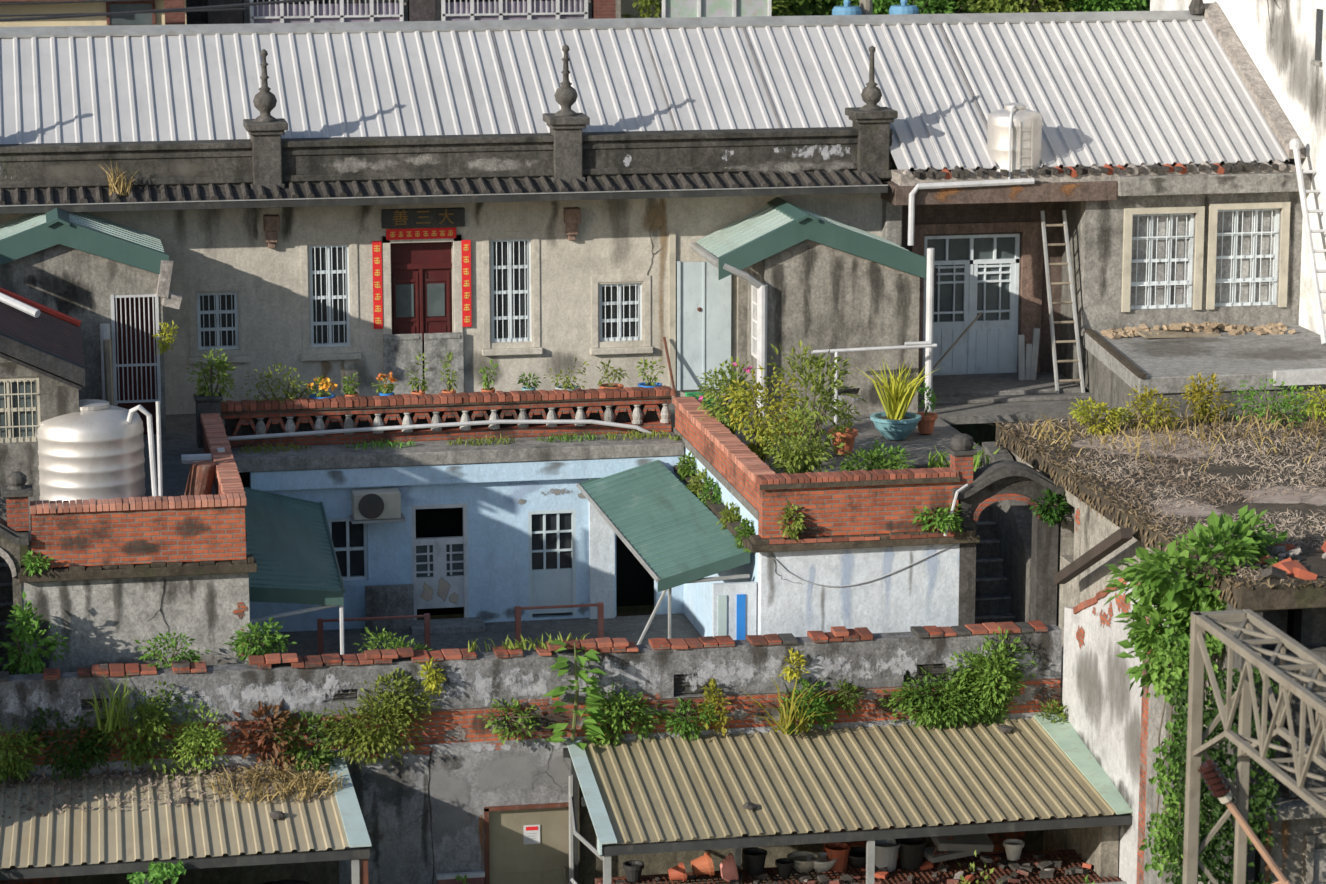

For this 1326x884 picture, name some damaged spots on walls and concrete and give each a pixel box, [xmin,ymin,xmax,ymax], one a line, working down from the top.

peeling [774,144,850,160]
damp [773,264,785,342]
damp [803,248,815,331]
damp [835,262,907,352]
damp [855,371,913,403]
damp [125,540,155,555]
damp [143,579,216,626]
damp [972,632,1127,708]
peeling [0,688,82,726]
peeling [108,674,353,741]
flaking render [308,724,435,760]
damp [1127,718,1141,769]